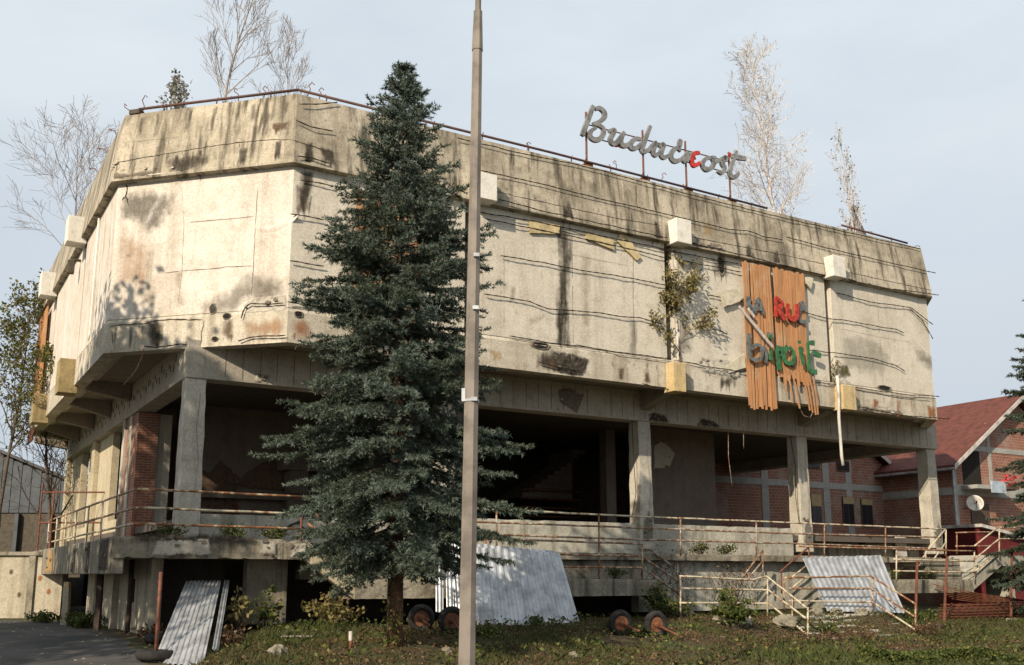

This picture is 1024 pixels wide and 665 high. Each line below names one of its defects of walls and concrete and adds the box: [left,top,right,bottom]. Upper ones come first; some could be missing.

leakage [257,102,286,158]
leakage [172,150,207,171]
leakage [297,143,334,211]
leakage [124,195,166,227]
leakage [541,228,572,373]
spalling [531,342,588,375]